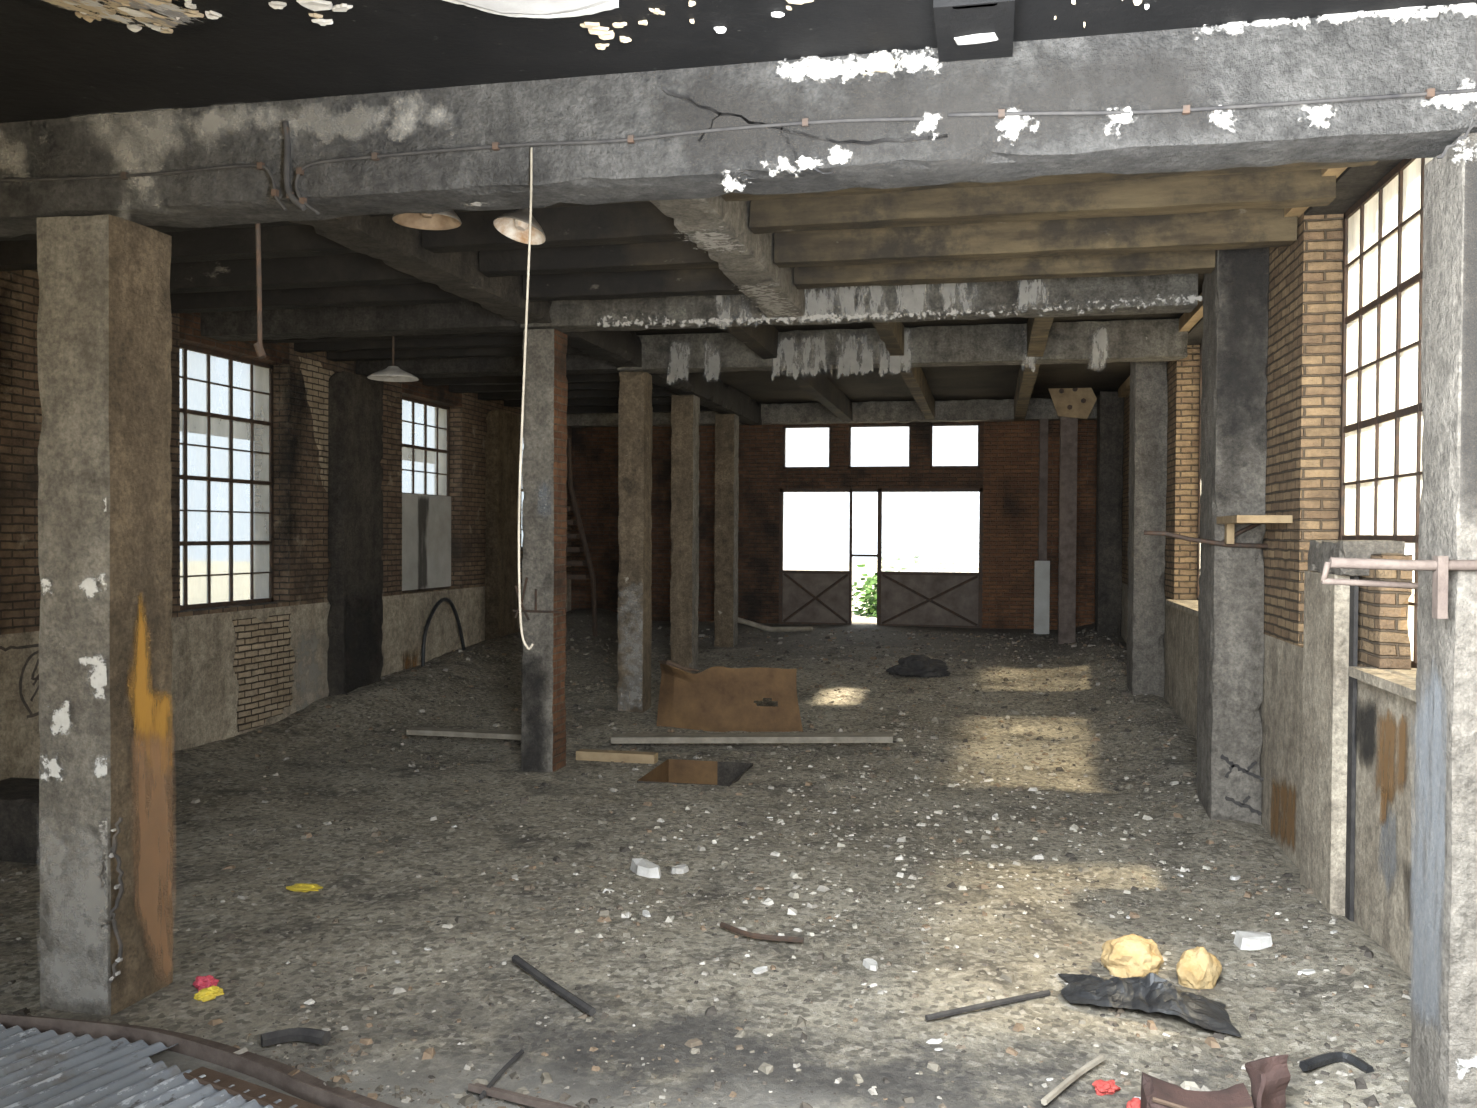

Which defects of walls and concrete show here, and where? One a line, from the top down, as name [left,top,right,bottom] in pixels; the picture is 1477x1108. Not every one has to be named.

peeling [42,0,228,34]
peeling [269,0,353,26]
flaking render [443,0,665,50]
peeling [771,0,814,18]
spalling [777,47,941,84]
spalling [1422,78,1477,110]
spalling [914,113,940,139]
spalling [996,108,1039,141]
peeling [597,279,1202,385]
rust [131,605,173,981]
crack [1220,754,1264,815]
rust [1376,710,1406,822]